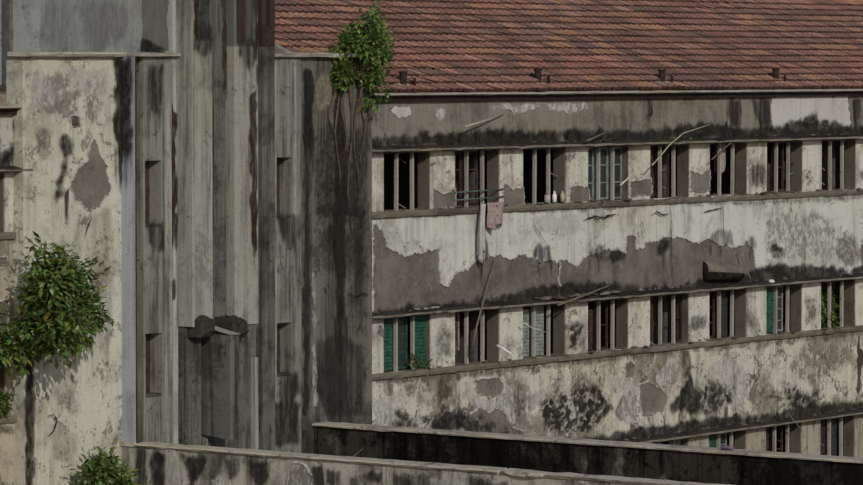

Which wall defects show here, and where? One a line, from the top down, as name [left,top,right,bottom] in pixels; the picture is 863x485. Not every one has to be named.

peeling [142,0,169,50]
damp [114,57,133,187]
peeling [389,106,411,119]
damp [372,98,863,147]
peeling [69,138,111,212]
peeling [413,187,457,217]
damp [275,68,366,445]
peeling [372,223,757,313]
damp [427,244,863,308]
peeling [837,235,863,266]
damp [395,379,509,434]
damp [541,351,863,441]